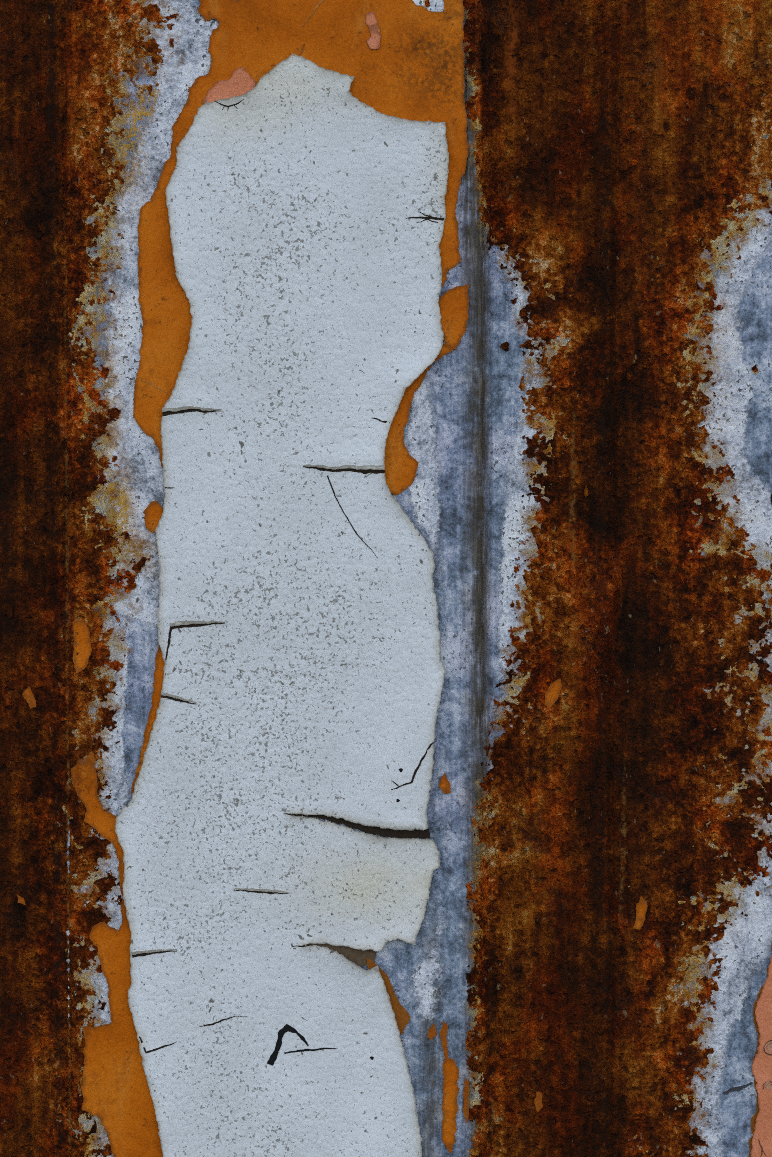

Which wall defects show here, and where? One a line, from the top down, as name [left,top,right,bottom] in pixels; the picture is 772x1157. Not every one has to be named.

peeling [365,12,381,50]
crack [303,464,385,557]
corrosion [404,380,444,598]
peeling [72,619,92,673]
corrosion [0,0,219,1157]
crack [165,621,225,660]
peeling [115,54,469,1157]
corrosion [463,0,772,1157]
crack [284,813,430,839]
crack [292,943,376,966]
corrosion [410,913,446,1021]
peeling [749,944,772,1157]